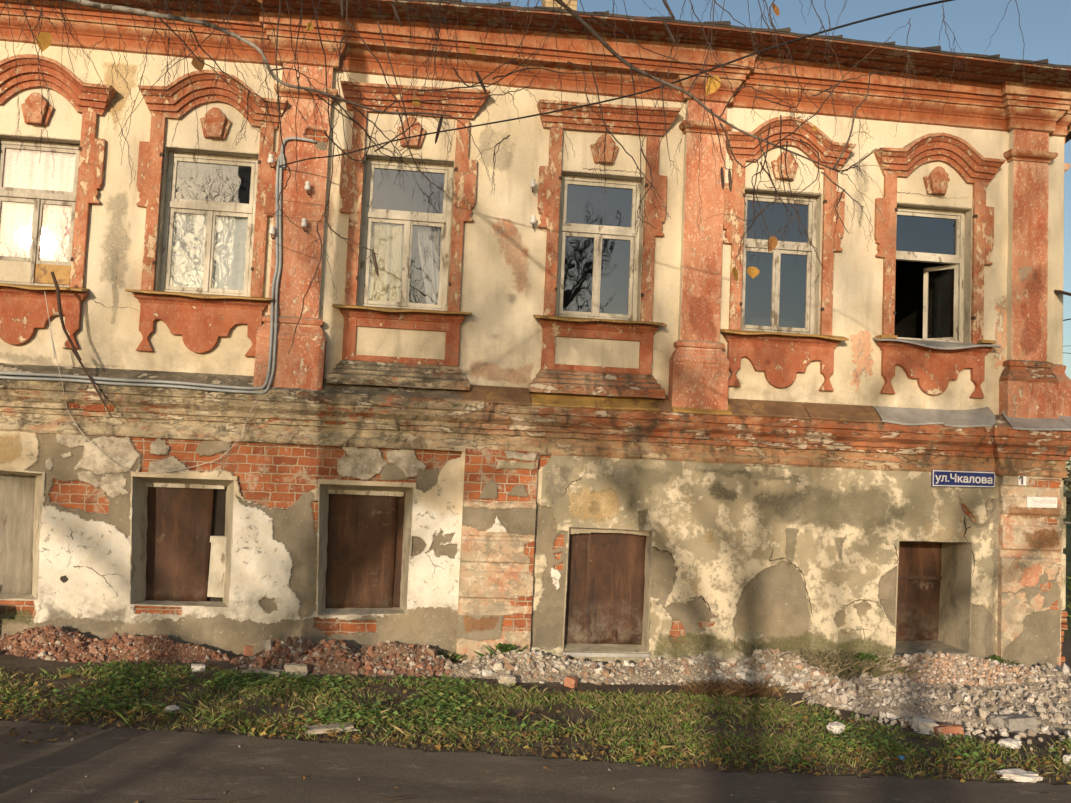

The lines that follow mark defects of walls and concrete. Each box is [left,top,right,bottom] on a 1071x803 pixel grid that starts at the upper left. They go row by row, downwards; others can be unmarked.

peeling [990,295,1007,370]
flaking render [1028,478,1061,489]
flaking render [25,433,568,651]
flaking render [648,547,719,658]
flaking render [733,561,812,652]
flaking render [834,566,897,642]
flaking render [968,563,1061,667]